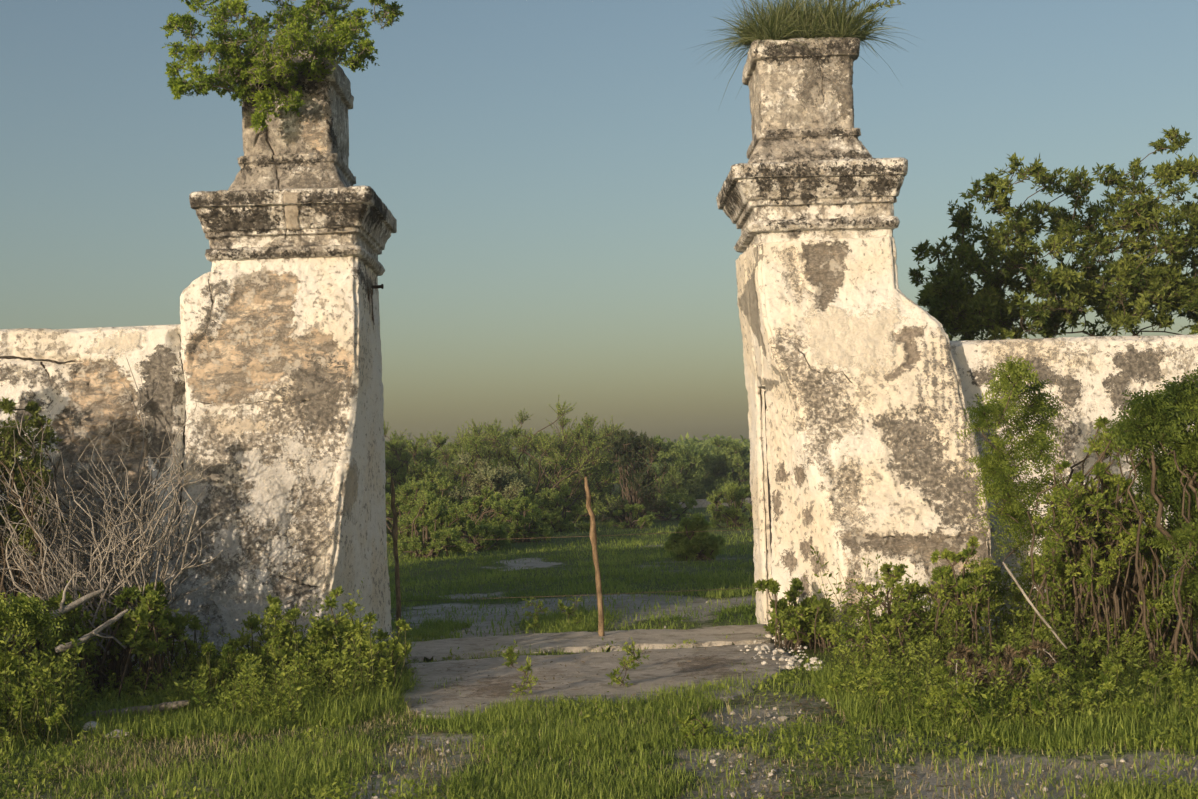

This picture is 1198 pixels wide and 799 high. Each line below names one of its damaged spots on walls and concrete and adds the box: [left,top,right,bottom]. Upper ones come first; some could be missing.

water stain [720,37,908,236]
crack [0,356,78,376]
spalling [34,355,155,589]
water stain [135,58,388,477]
peeling [173,265,360,648]
spalling [774,239,852,312]
water stain [818,327,1023,533]
water stain [992,339,1196,485]